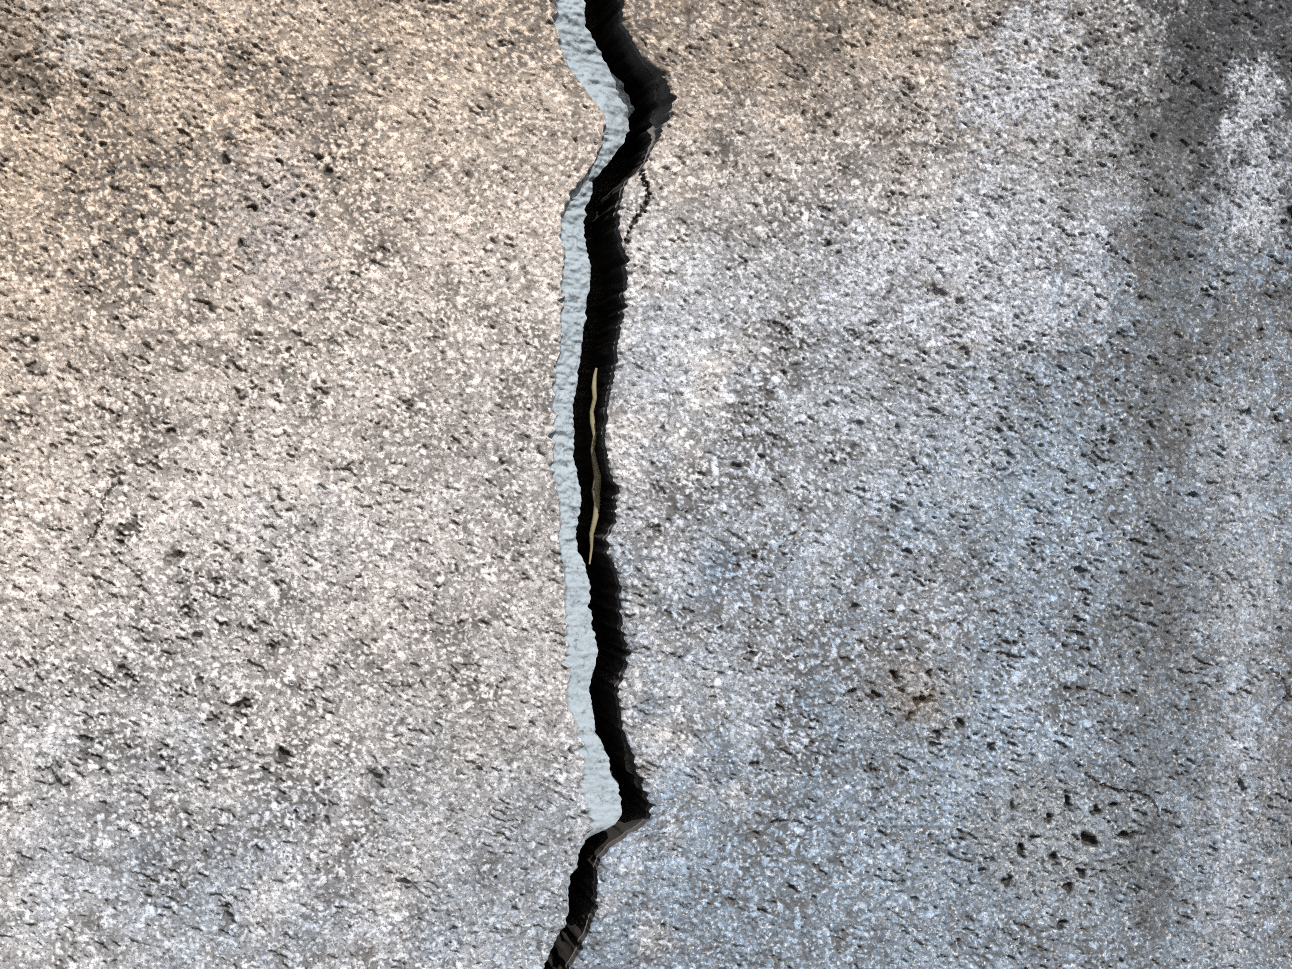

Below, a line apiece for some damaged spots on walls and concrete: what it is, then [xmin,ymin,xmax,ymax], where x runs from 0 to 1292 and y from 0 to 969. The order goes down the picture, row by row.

crack [543,0,677,969]